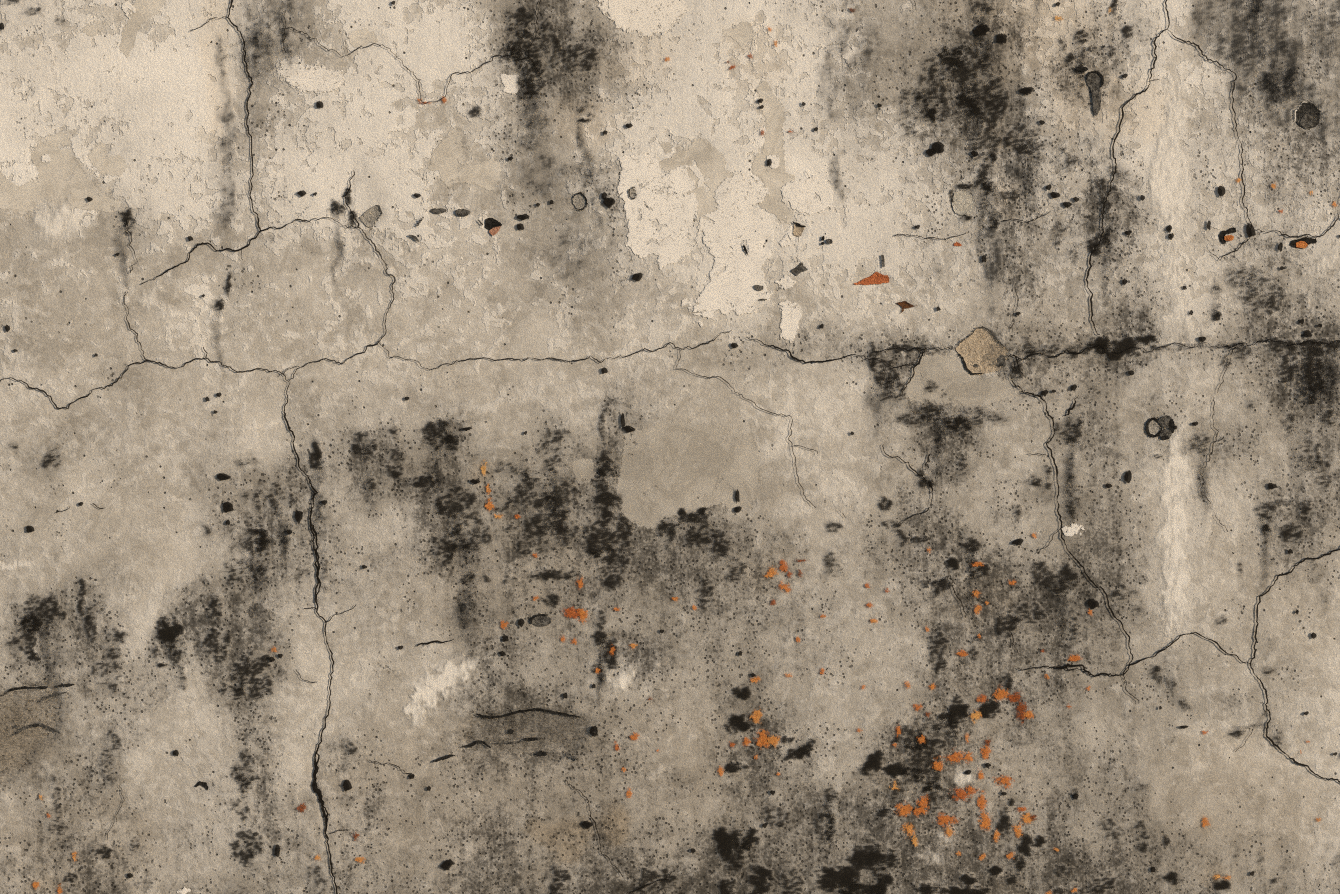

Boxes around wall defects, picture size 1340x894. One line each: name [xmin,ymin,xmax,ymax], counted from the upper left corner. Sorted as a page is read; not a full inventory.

spalling [408,200,554,242]
peeling [572,81,834,343]
crack [894,231,969,239]
crack [0,0,950,894]
damp [352,408,633,621]
peeling [897,326,1019,409]
crack [1006,0,1340,783]
damp [1008,83,1340,544]
corrosion [730,709,780,759]
damp [712,806,901,894]
corrosion [889,781,958,847]
corrosion [932,688,1037,842]